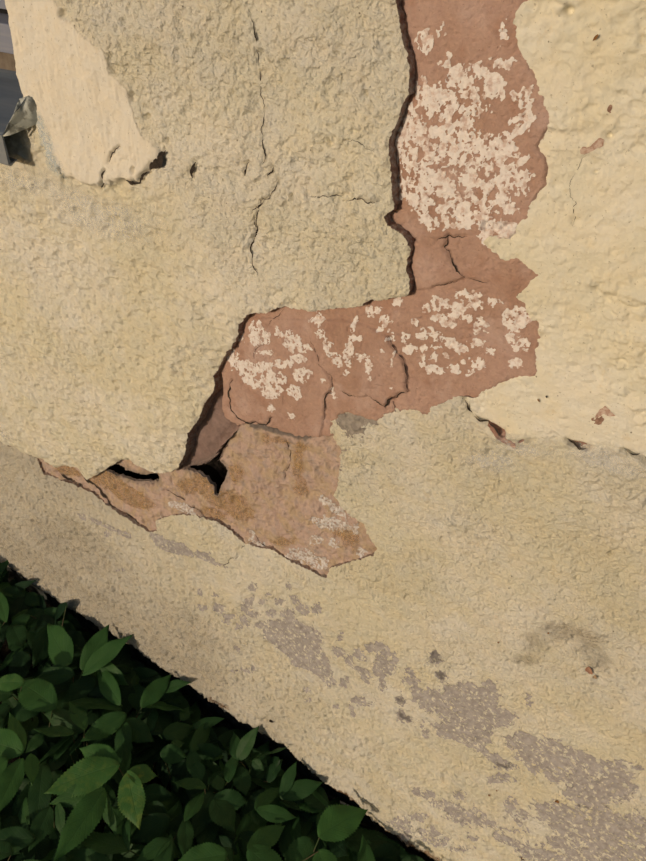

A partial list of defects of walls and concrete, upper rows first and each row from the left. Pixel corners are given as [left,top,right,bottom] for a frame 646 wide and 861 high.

crack [244,19,278,275]
flaking render [580,138,604,155]
crack [126,150,166,186]
flaking render [38,0,549,575]
crack [310,336,408,420]
crack [465,400,501,437]
flaking render [591,406,615,425]